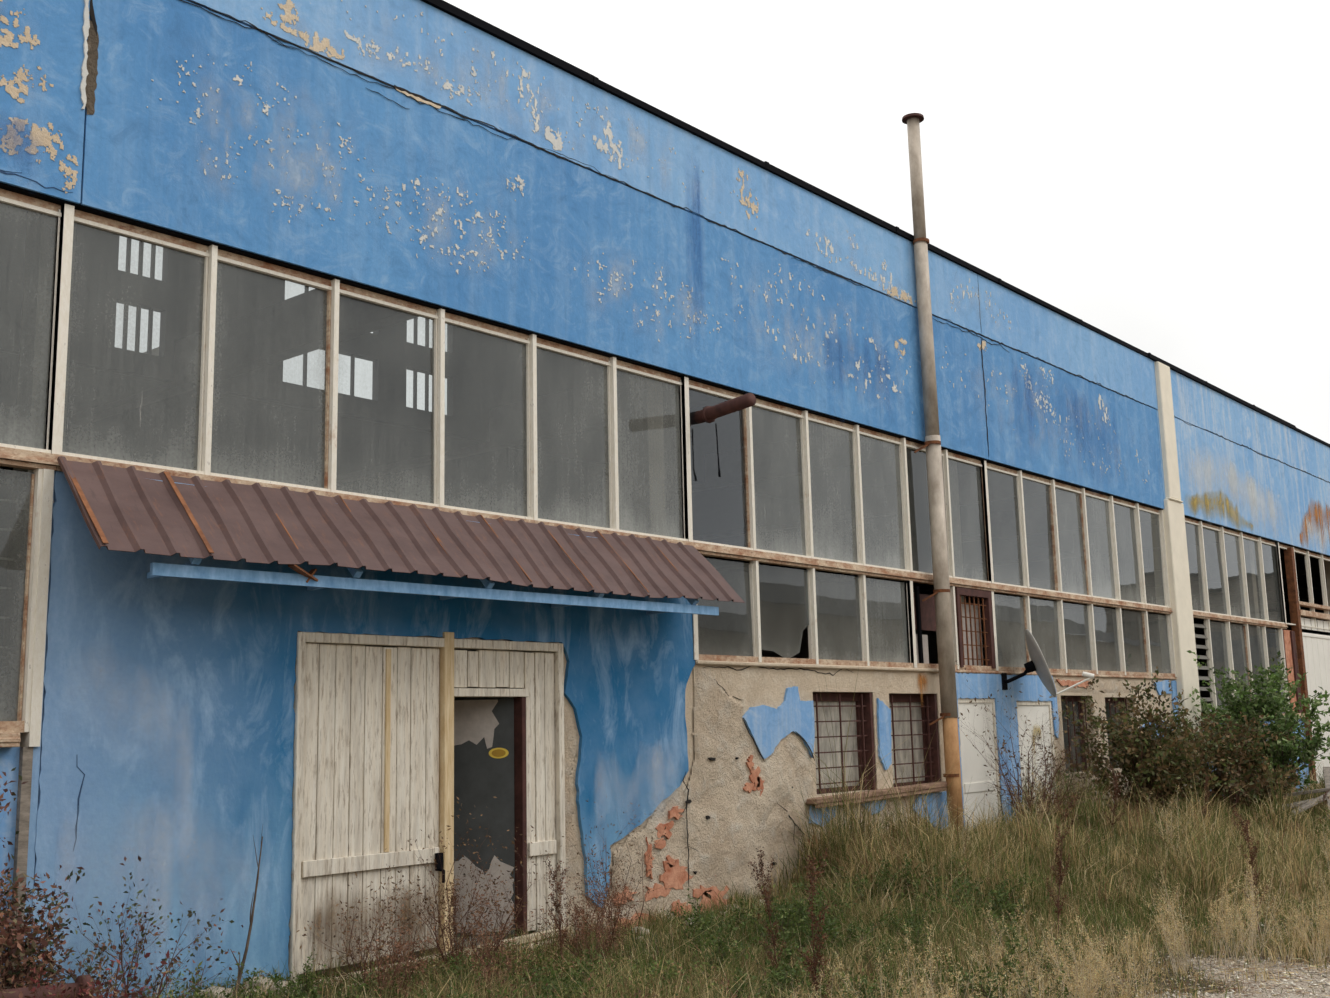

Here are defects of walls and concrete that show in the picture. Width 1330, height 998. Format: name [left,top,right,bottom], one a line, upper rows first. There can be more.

peeling [0,0,40,50]
peeling [0,64,78,193]
peeling [147,54,297,124]
peeling [261,0,647,170]
peeling [197,121,530,274]
peeling [730,168,759,230]
peeling [627,263,746,342]
peeling [721,258,911,400]
peeling [806,229,916,305]
corrosion [1191,493,1253,526]
corrosion [1300,506,1330,542]
flaking render [564,668,932,936]